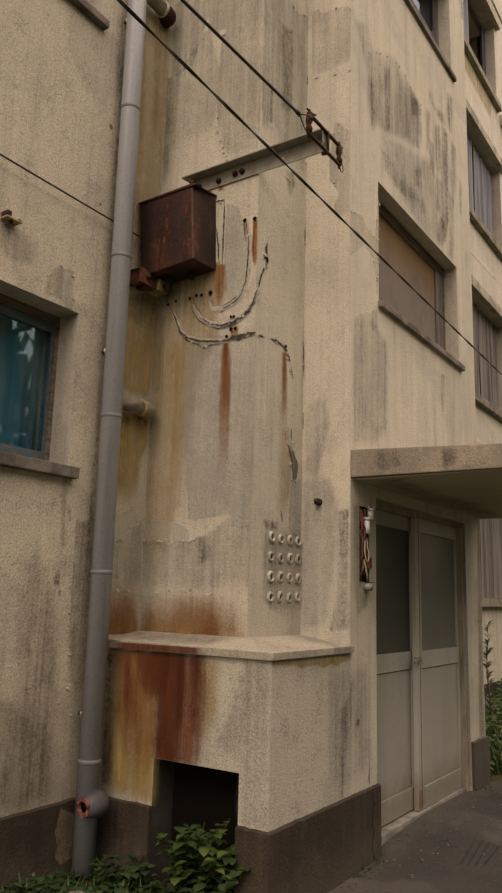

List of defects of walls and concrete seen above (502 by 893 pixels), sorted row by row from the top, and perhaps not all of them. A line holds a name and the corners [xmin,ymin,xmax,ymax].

rust [245,221,257,262]
crack [167,199,304,376]
rust [220,329,237,417]
flaking render [287,428,299,483]
rust [109,600,234,764]